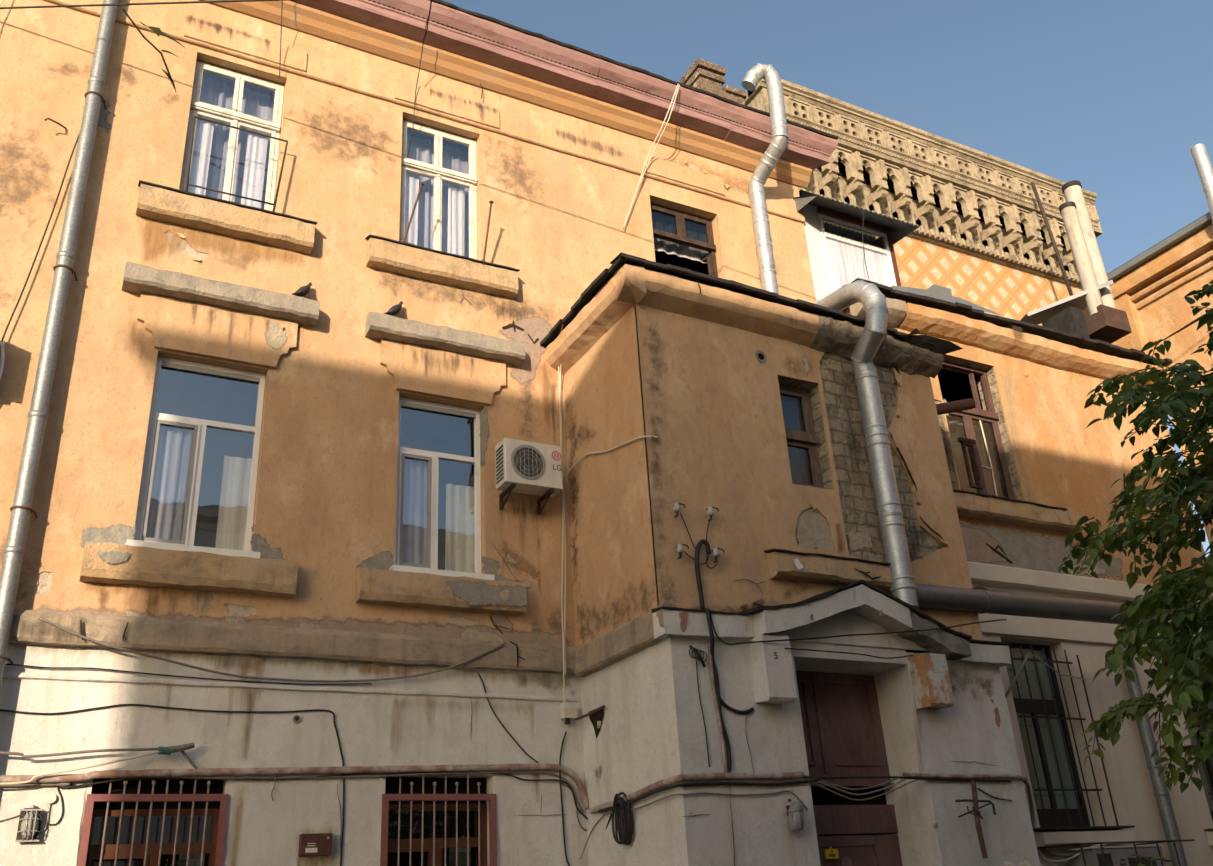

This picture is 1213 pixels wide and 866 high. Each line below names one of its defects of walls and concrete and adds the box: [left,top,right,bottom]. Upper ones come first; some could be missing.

leakage [0,147,46,201]
peeling [500,317,551,384]
spalling [887,367,948,556]
spalling [793,503,873,569]
peeling [32,572,568,647]